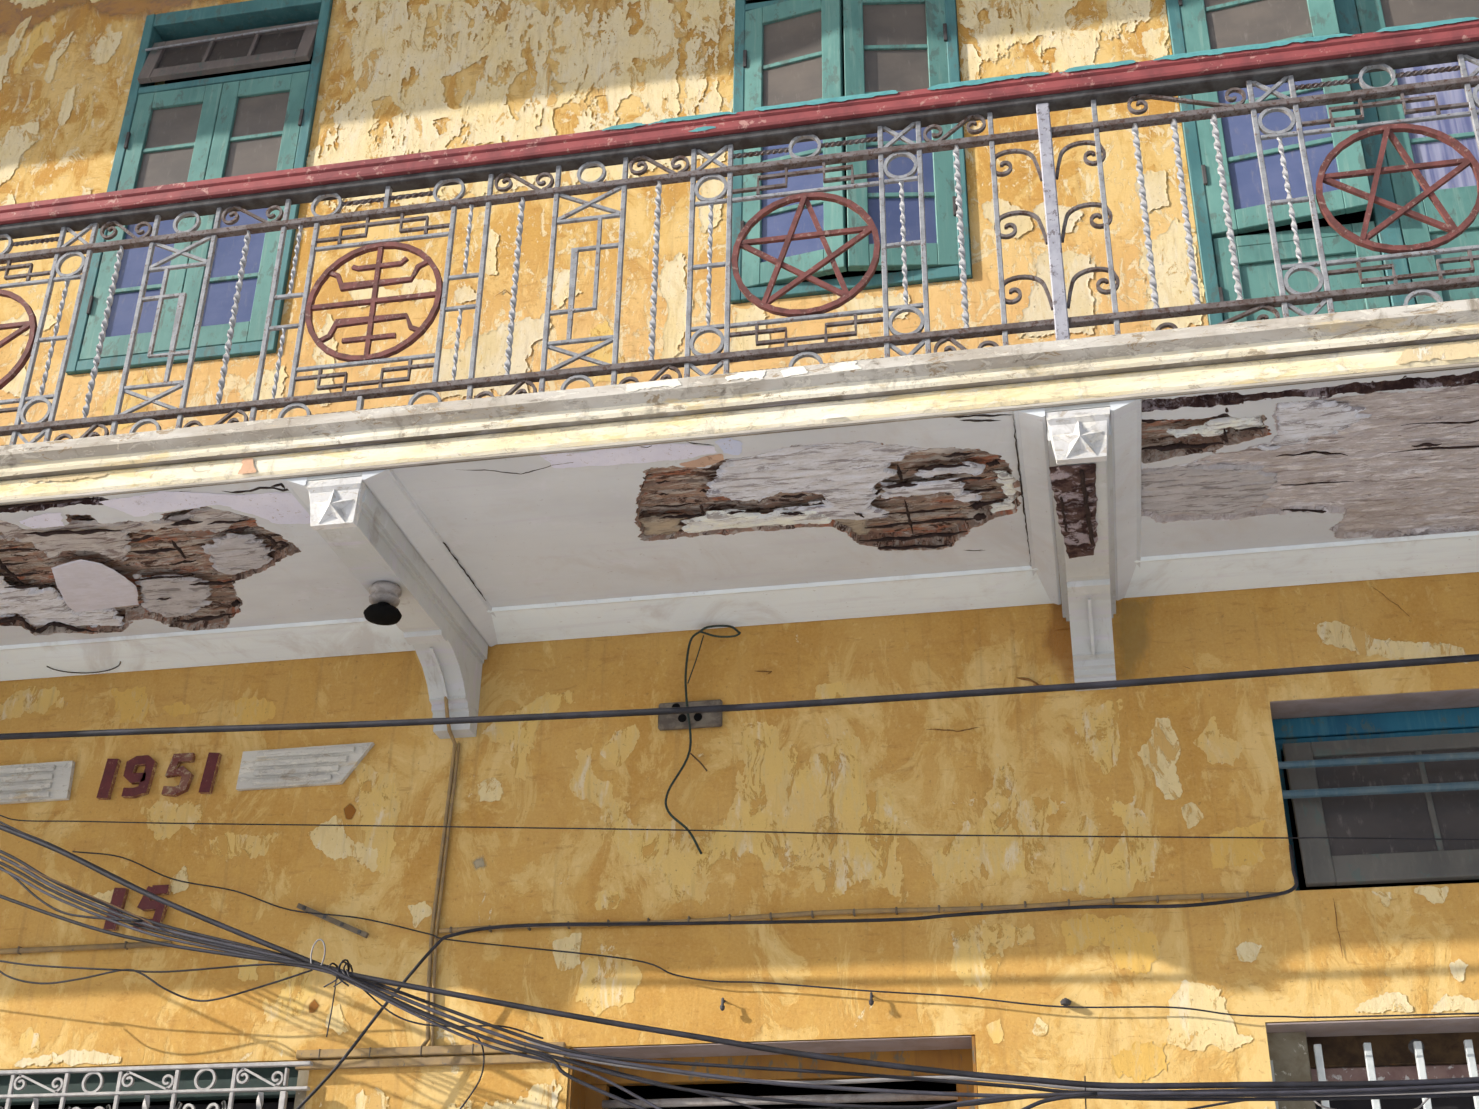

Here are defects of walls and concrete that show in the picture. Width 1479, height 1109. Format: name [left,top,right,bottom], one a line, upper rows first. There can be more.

peeling [306,0,898,167]
peeling [927,0,1353,90]
peeling [309,152,728,233]
spalling [0,472,310,636]
spalling [540,438,1021,551]
spalling [1049,463,1098,559]
spalling [1141,342,1479,539]
peeling [569,717,909,906]
peeling [931,753,1159,898]
peeling [1138,716,1244,829]
peeling [553,933,642,1016]
peeling [1166,980,1253,1052]